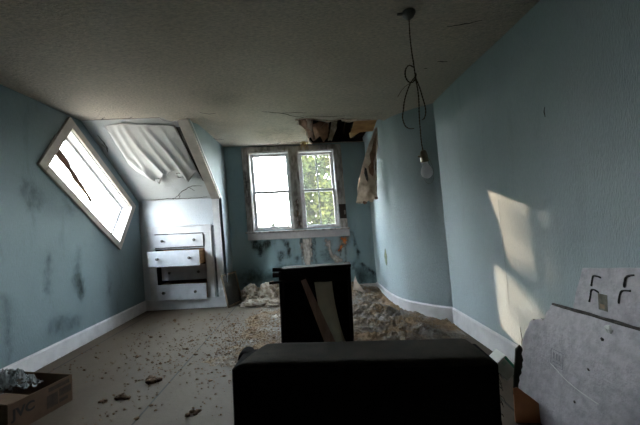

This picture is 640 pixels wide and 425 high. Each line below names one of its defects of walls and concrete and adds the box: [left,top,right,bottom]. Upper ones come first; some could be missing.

leakage [296,238,316,265]
leakage [355,263,374,284]